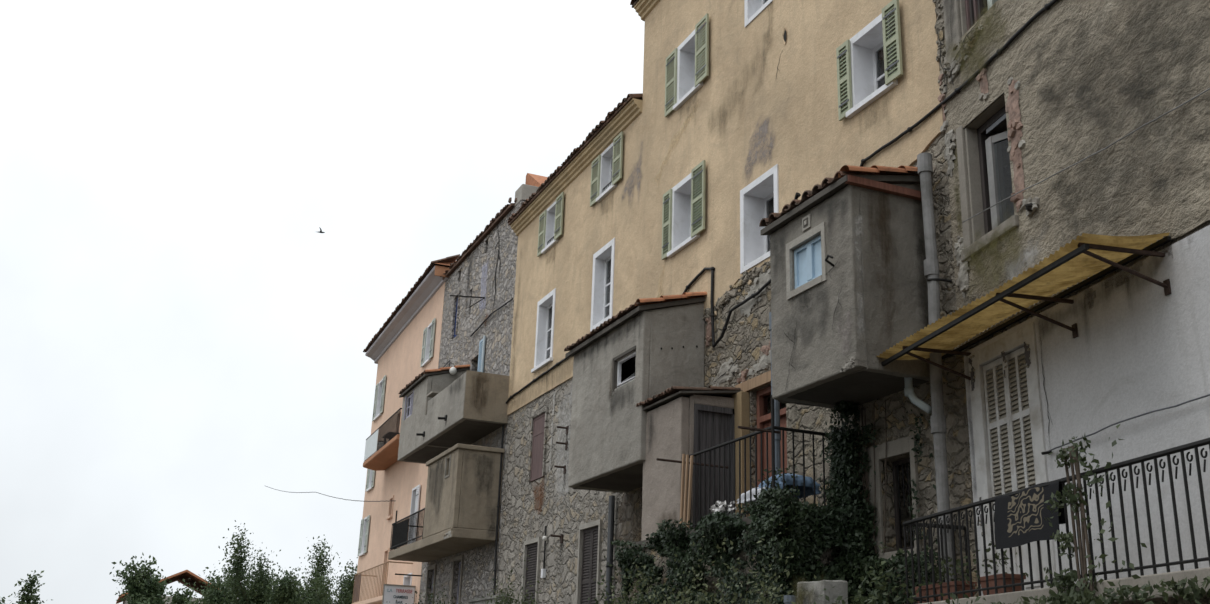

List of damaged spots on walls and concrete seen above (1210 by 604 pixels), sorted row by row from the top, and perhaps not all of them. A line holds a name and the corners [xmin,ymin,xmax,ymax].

flaking render [1005,77,1040,217]